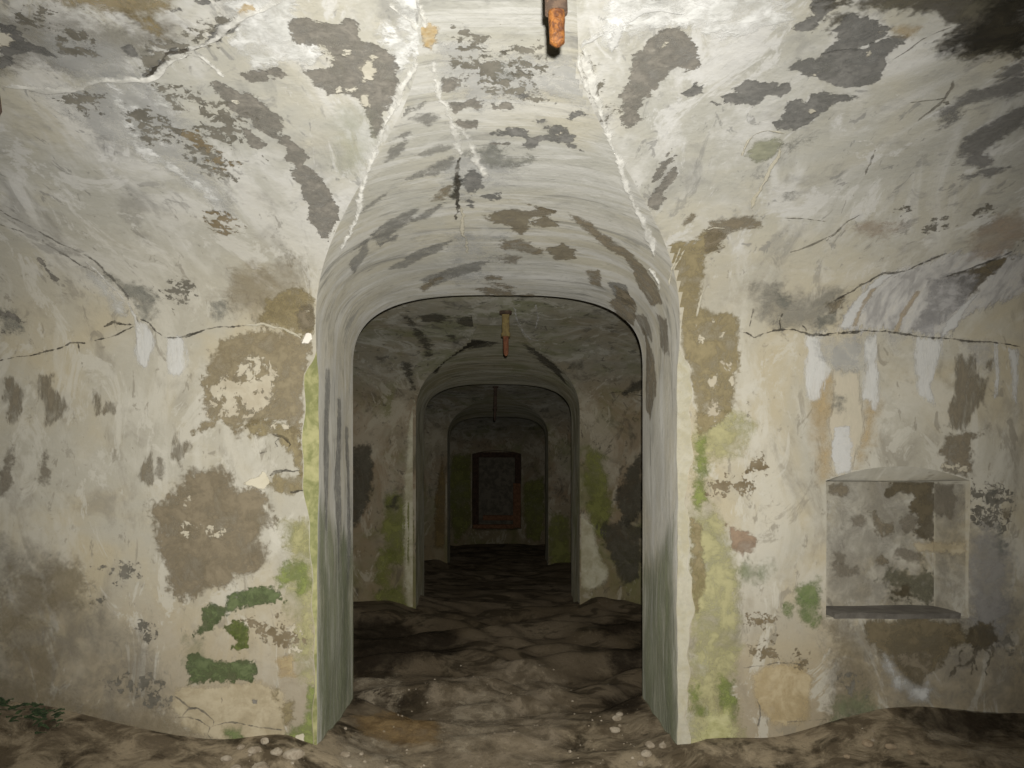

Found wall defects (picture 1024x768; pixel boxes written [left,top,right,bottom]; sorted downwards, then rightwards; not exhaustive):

crack [6,3,280,94]
leakage [403,104,437,126]
crack [433,62,488,253]
crack [0,211,301,361]
leakage [669,216,761,434]
crack [744,313,1016,347]
leakage [763,249,1024,496]
crack [826,240,1024,307]
flaking render [243,471,270,489]
flaking render [246,420,303,473]
leakage [581,454,643,589]